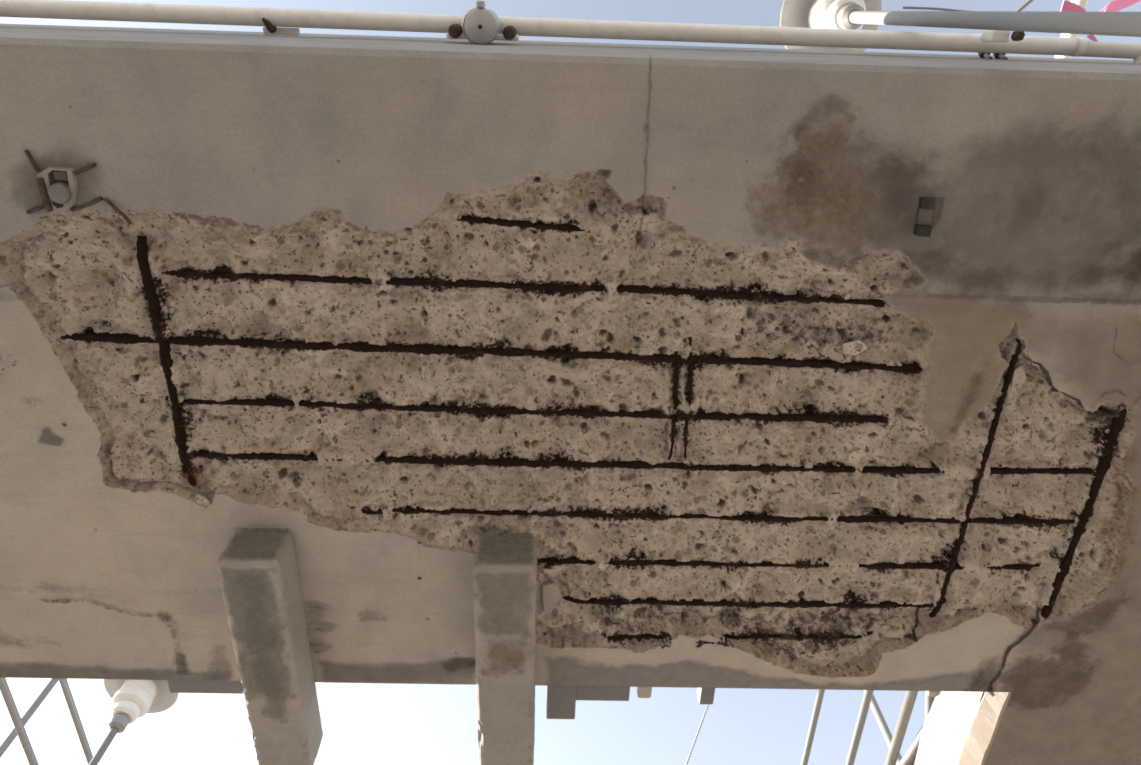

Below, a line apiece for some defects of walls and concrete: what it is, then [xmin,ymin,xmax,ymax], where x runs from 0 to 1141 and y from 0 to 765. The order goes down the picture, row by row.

rust [757,310,890,346]
spalling [0,168,1134,678]
rust [1086,405,1121,426]
rust [600,604,898,663]
crack [988,606,1040,697]